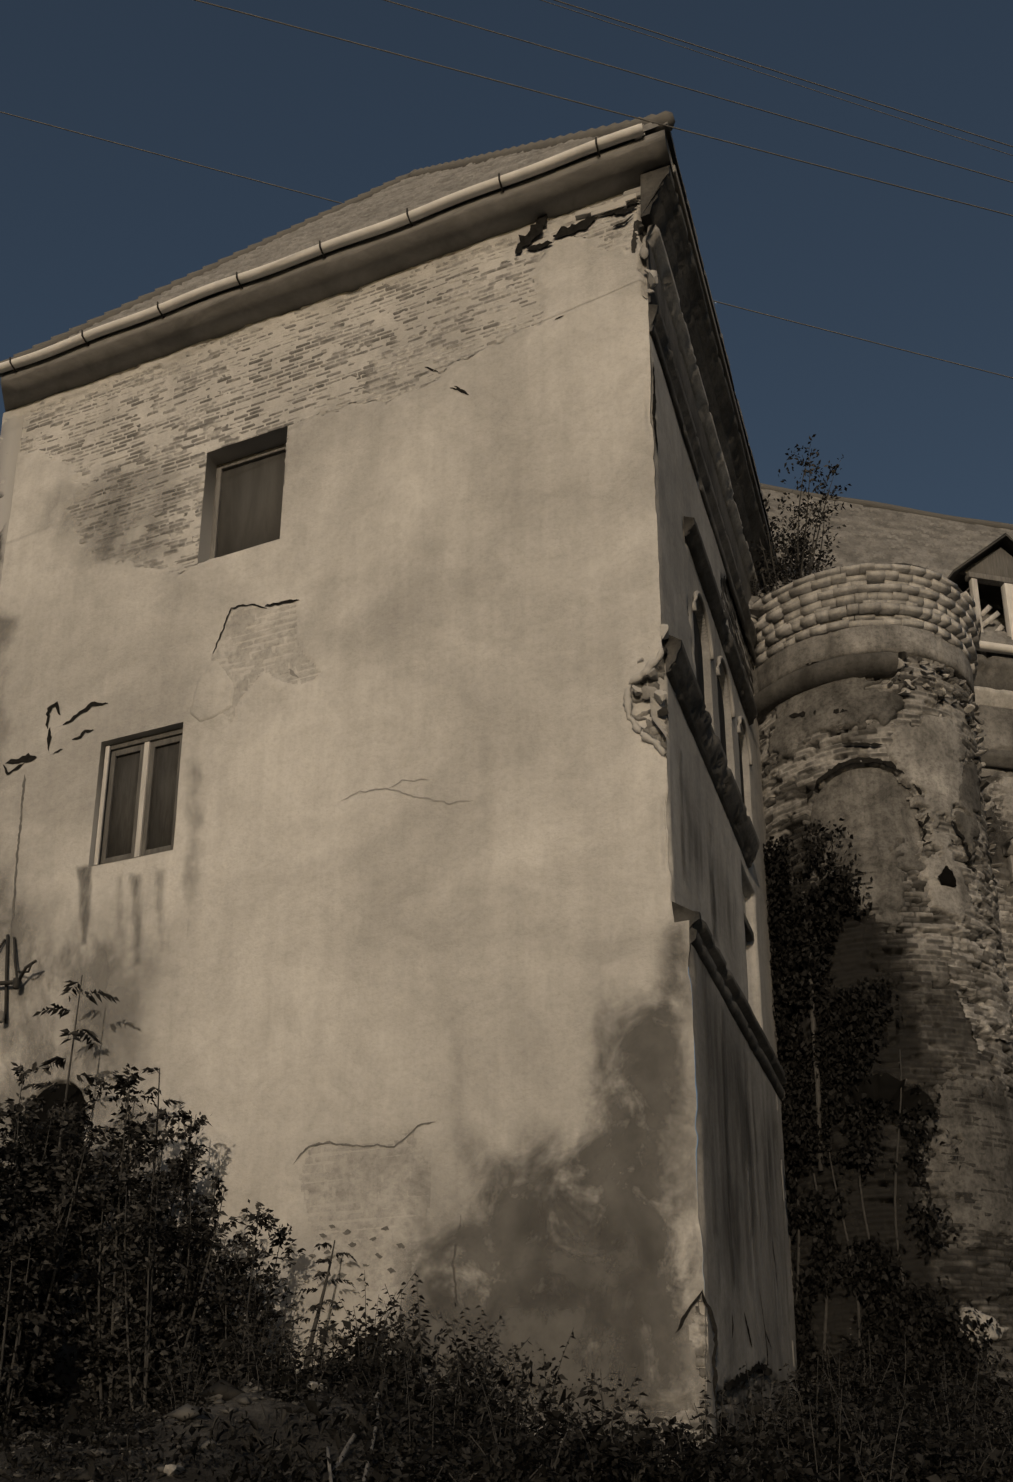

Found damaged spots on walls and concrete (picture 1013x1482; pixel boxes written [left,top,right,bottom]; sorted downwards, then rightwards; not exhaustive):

flaking render [20,186,658,574]
flaking render [211,599,321,723]
crack [341,778,472,805]
spalling [623,624,669,756]
flaking render [887,651,1013,1054]
water stain [0,867,148,1428]
water stain [402,932,700,1452]
spalling [839,1073,938,1121]